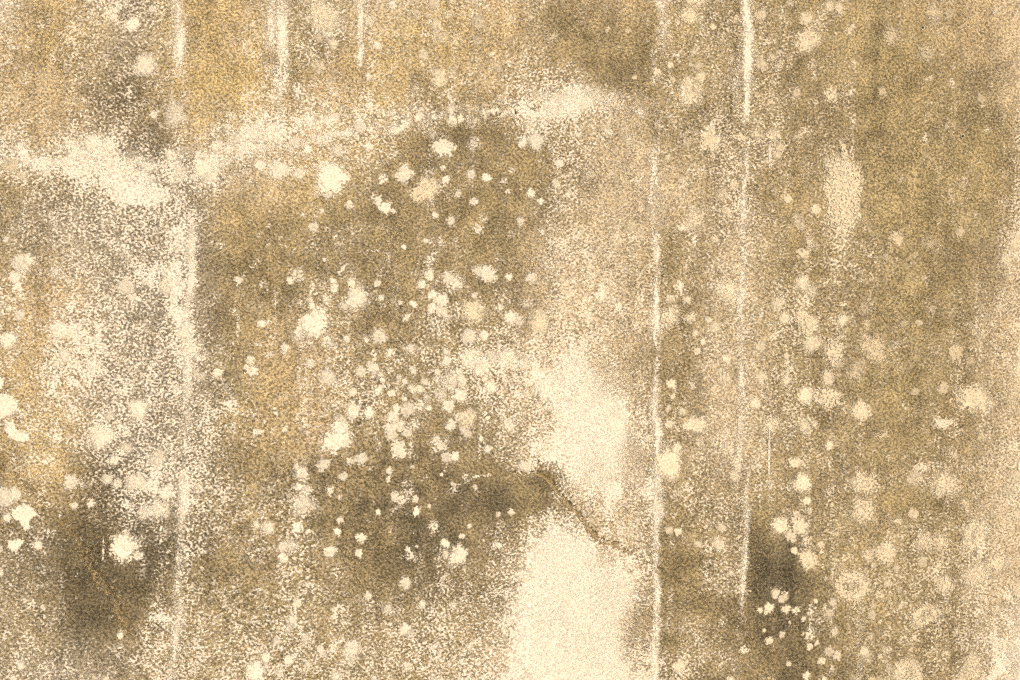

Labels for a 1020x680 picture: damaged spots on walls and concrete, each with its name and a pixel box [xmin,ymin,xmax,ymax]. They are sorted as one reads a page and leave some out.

crack [434,460,770,658]